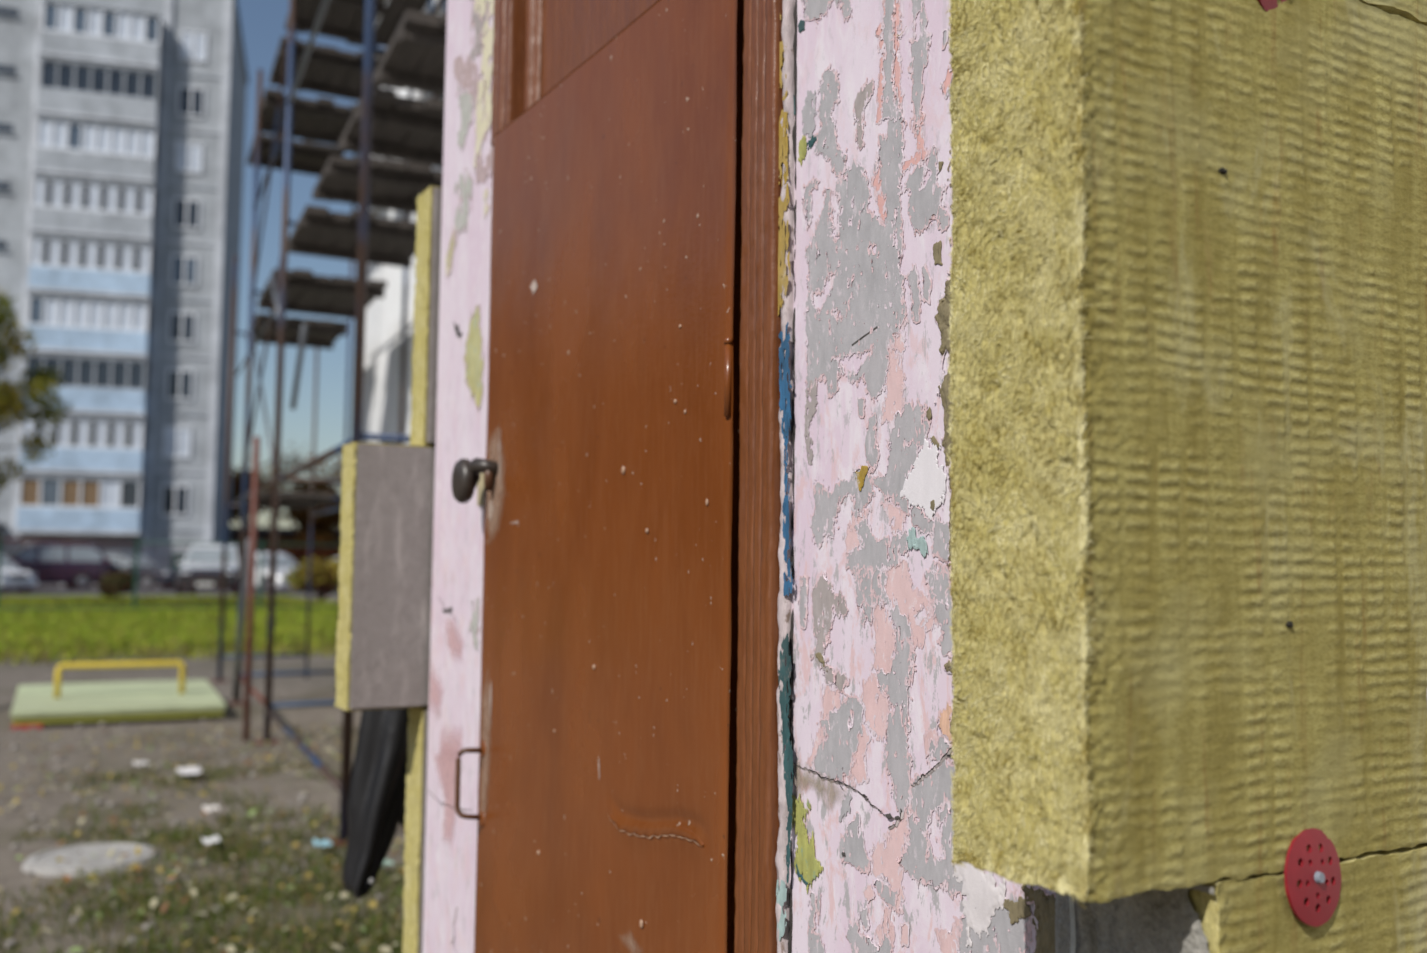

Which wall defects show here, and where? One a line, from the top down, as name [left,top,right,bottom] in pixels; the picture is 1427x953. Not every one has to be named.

peeling [454,304,484,412]
peeling [445,0,494,278]
crack [788,0,953,953]
peeling [776,0,1056,953]